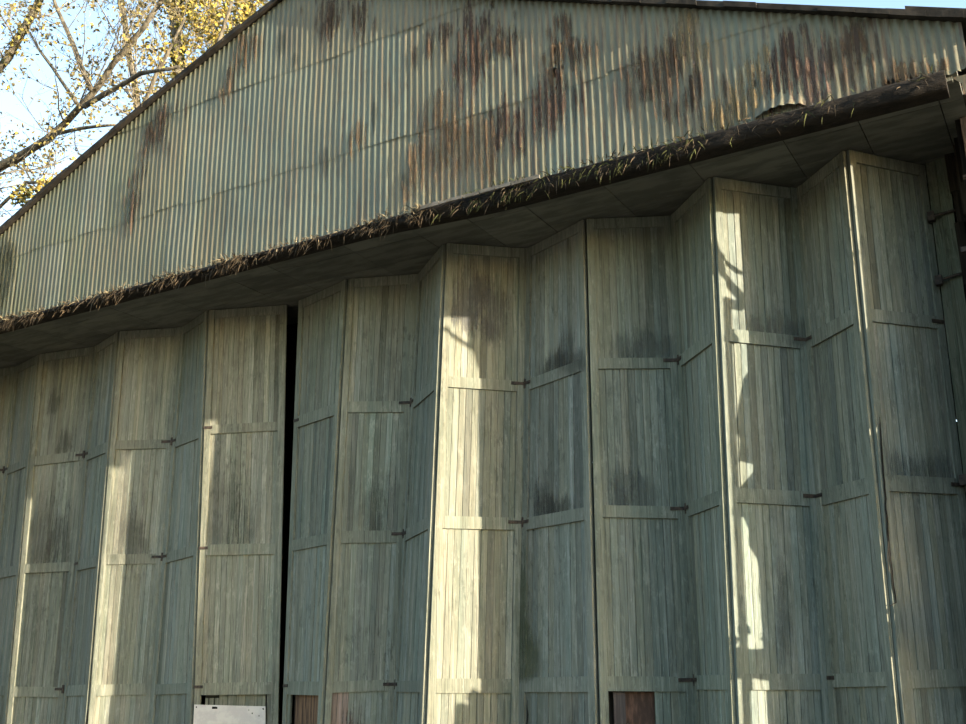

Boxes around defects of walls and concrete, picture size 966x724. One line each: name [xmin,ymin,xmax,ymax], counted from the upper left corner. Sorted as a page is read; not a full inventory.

rust [218,30,263,103]
rust [315,0,376,49]
rust [401,0,598,205]
rust [619,10,949,132]
rust [122,98,187,236]